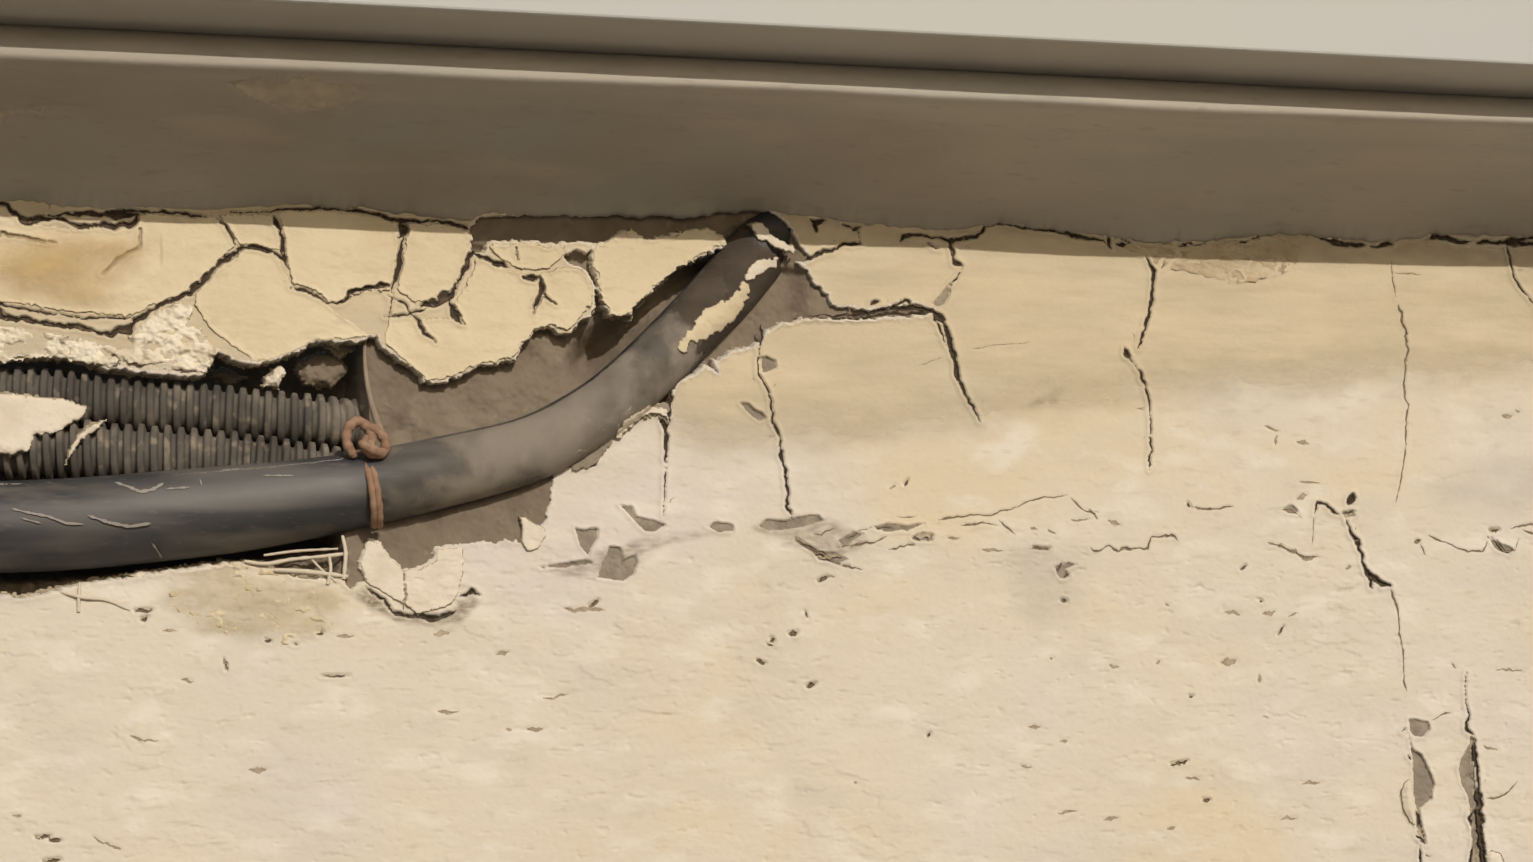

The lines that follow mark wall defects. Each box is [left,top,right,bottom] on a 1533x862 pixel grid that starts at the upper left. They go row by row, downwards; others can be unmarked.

crack [0,201,555,339]
spalling [0,207,949,450]
peeling [569,394,671,471]
crack [753,325,1233,570]
crack [805,219,1272,467]
crack [1320,238,1409,501]
spalling [0,476,553,646]
peeling [541,529,637,581]
peeling [760,515,960,581]
crack [1274,494,1407,691]
peeling [1409,719,1433,842]
crack [1402,676,1517,862]